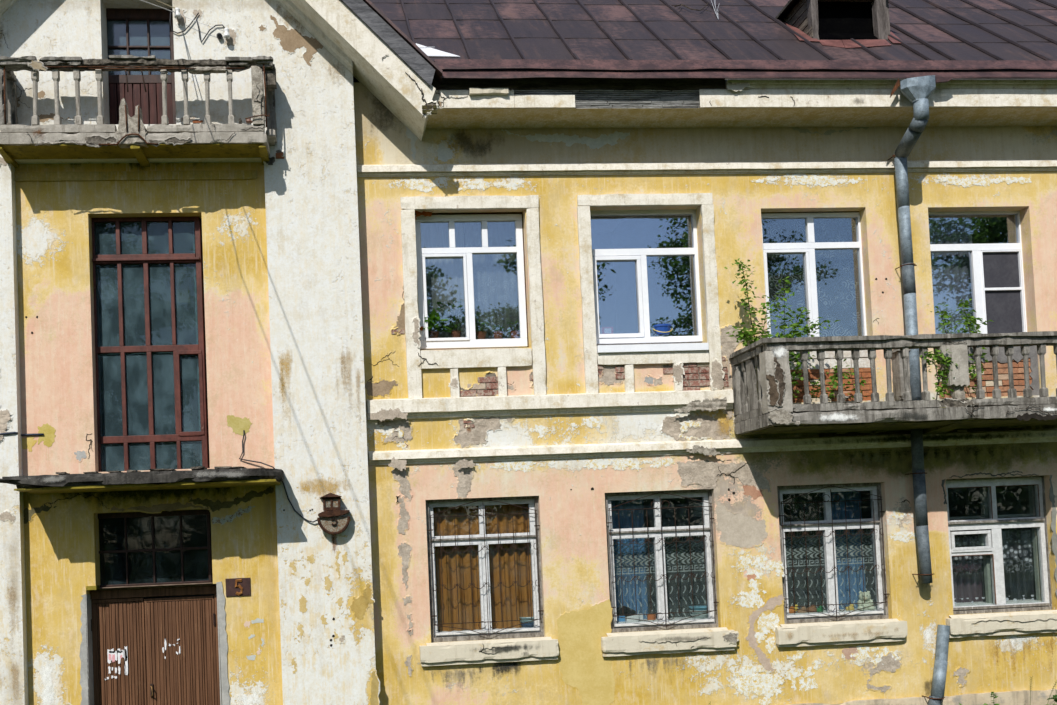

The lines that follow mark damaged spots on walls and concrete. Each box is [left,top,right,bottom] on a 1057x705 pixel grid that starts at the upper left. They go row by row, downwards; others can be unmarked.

flaking render [259,15,325,67]
flaking render [365,378,399,399]
crack [368,337,438,384]
flaking render [448,370,516,396]
flaking render [644,324,746,391]
spalling [766,350,801,426]
flaking render [0,393,23,444]
flaking render [452,416,503,449]
flaking render [660,409,734,441]
flaking render [584,457,772,499]
flaking render [714,502,819,705]
flaking render [842,645,902,693]